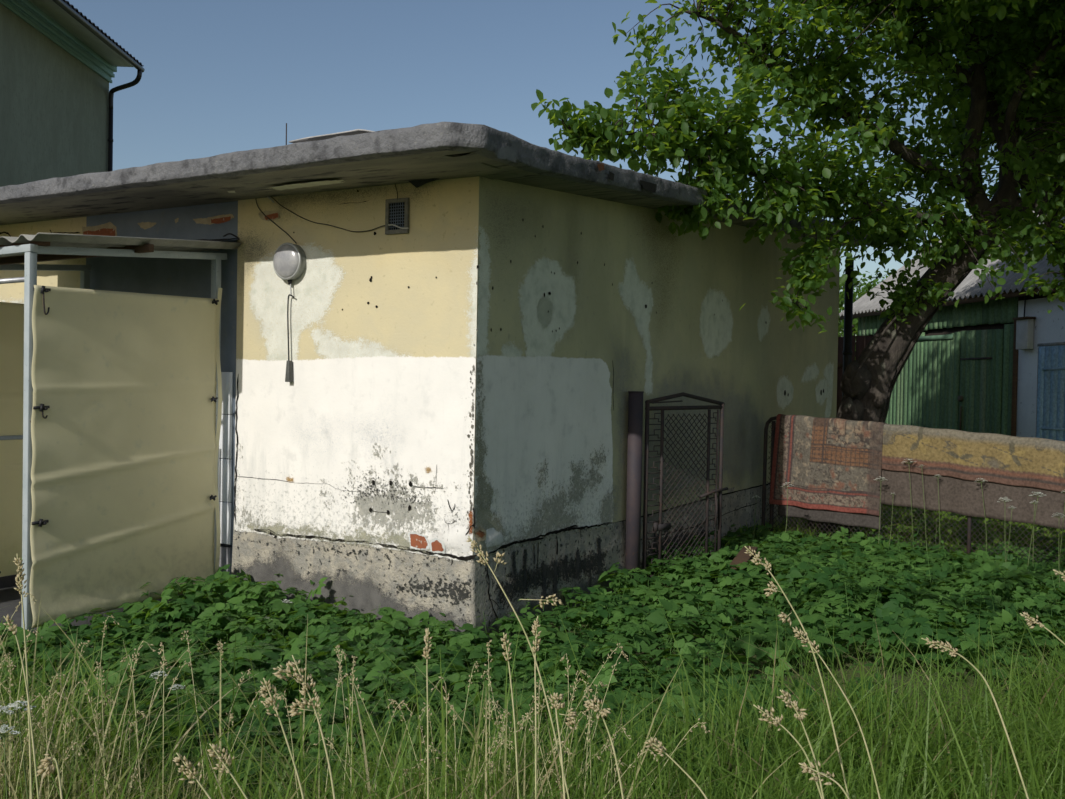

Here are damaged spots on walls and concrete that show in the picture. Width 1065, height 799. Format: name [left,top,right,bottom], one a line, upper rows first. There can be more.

water stain [232,539,471,644]
peeling [234,357,618,559]
crack [234,377,770,619]
water stain [487,538,622,639]
water stain [606,324,767,575]